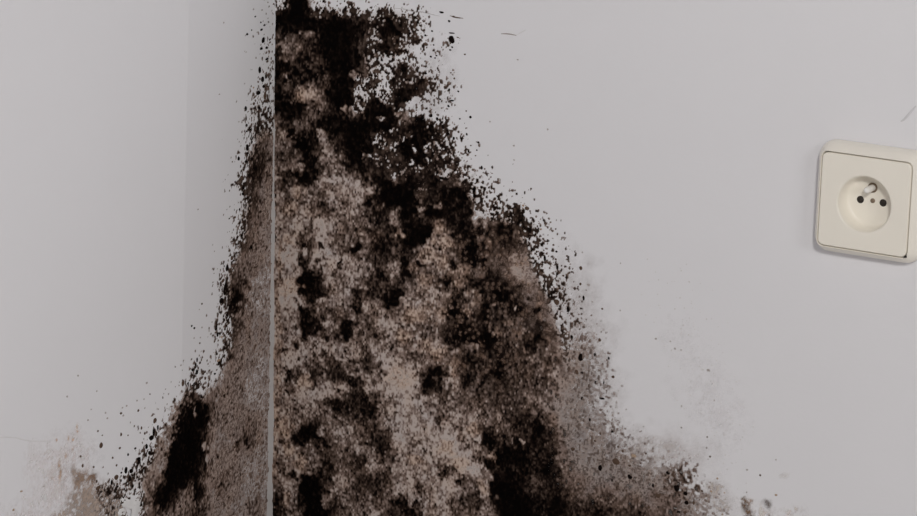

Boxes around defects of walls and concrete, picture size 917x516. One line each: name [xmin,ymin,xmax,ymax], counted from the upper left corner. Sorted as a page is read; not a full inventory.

leakage [43,0,728,516]